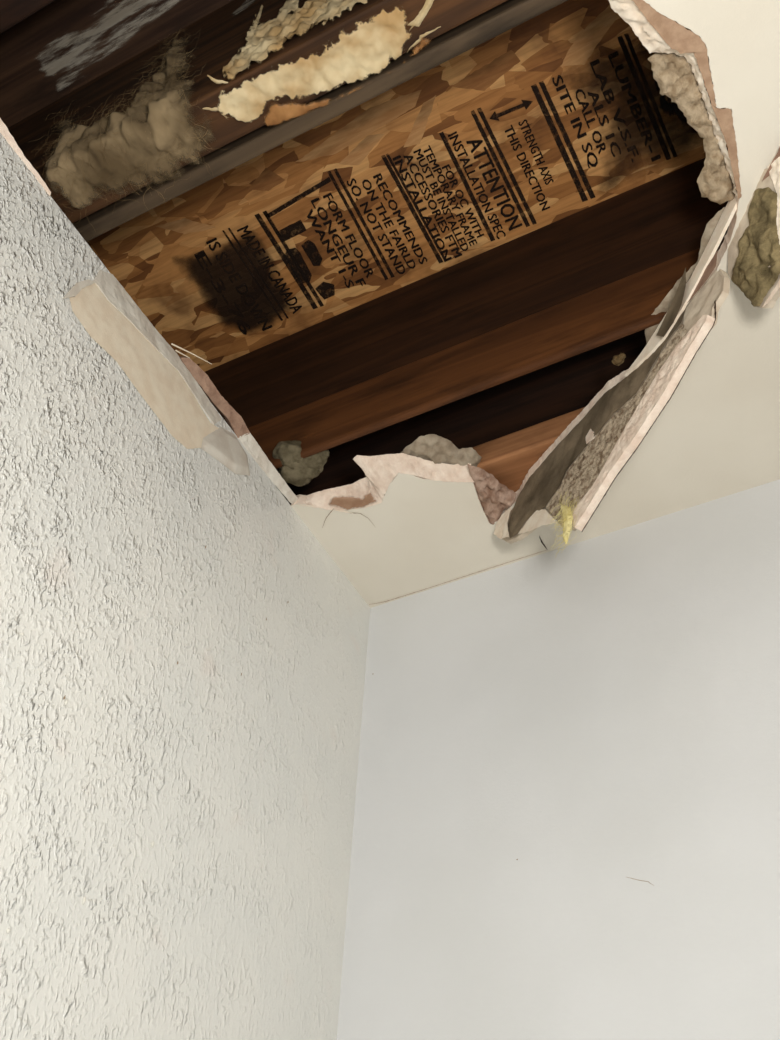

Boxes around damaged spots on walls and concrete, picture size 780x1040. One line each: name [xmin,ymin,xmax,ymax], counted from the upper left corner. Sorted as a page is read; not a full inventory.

spalling [609,0,742,204]
peeling [63,270,250,476]
spalling [298,434,517,525]